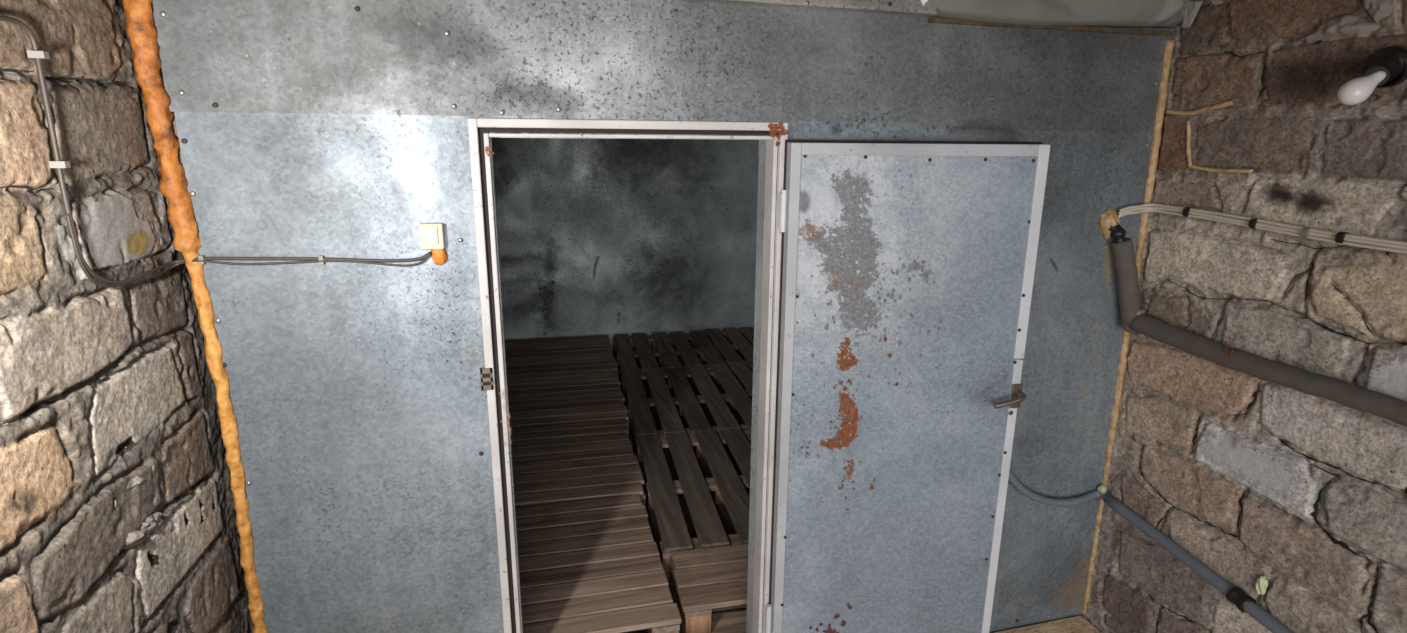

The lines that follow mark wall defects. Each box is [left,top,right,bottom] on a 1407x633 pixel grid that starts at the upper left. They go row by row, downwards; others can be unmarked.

rust [768,122,788,146]
peeling [799,168,935,357]
rust [806,337,875,511]
rust [809,603,852,633]